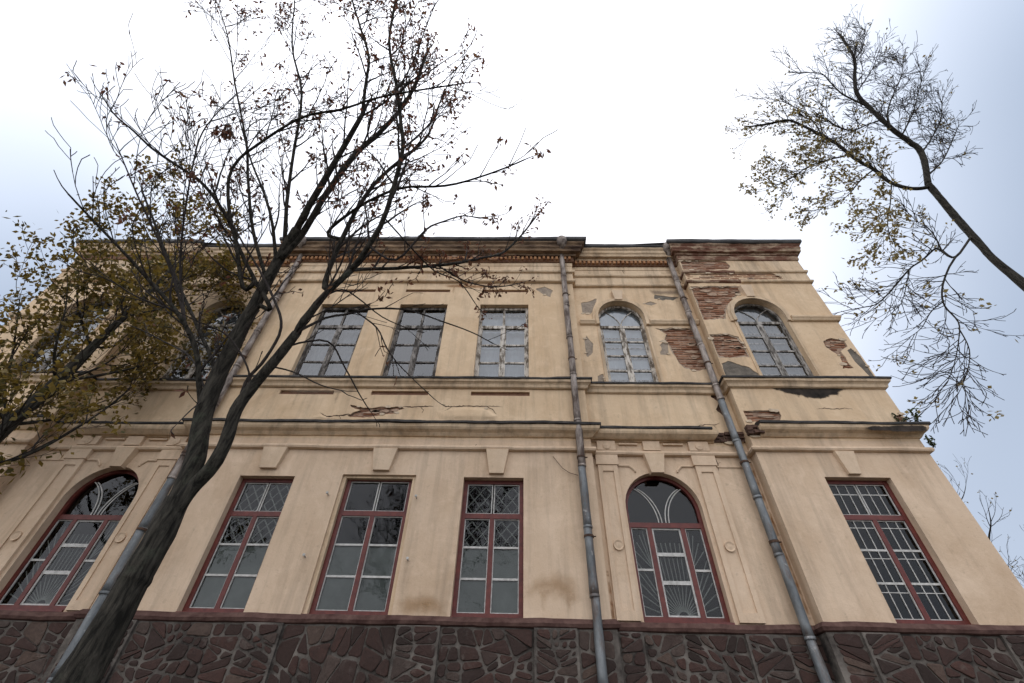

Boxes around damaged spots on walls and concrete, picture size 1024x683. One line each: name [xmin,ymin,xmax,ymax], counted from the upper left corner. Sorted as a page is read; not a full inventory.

flaking render [643,260,782,320]
flaking render [581,299,597,315]
flaking render [583,336,593,357]
flaking render [657,326,750,372]
flaking render [823,338,870,369]
flaking render [349,405,404,418]
crack [403,405,500,414]
flaking render [723,408,781,445]